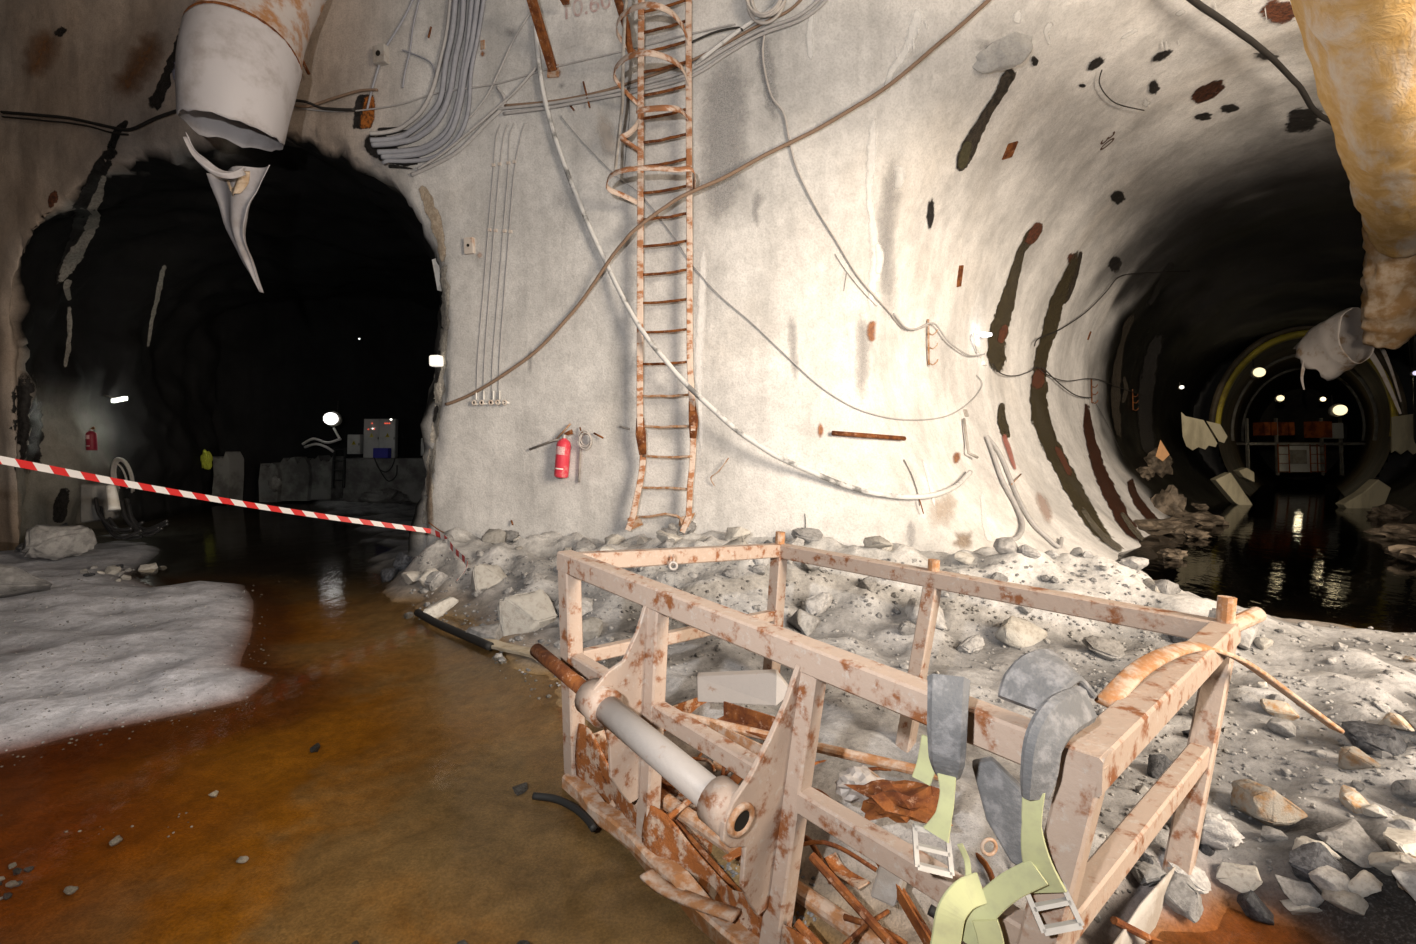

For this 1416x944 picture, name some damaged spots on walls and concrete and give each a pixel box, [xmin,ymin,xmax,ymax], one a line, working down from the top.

leakage [149,28,180,111]